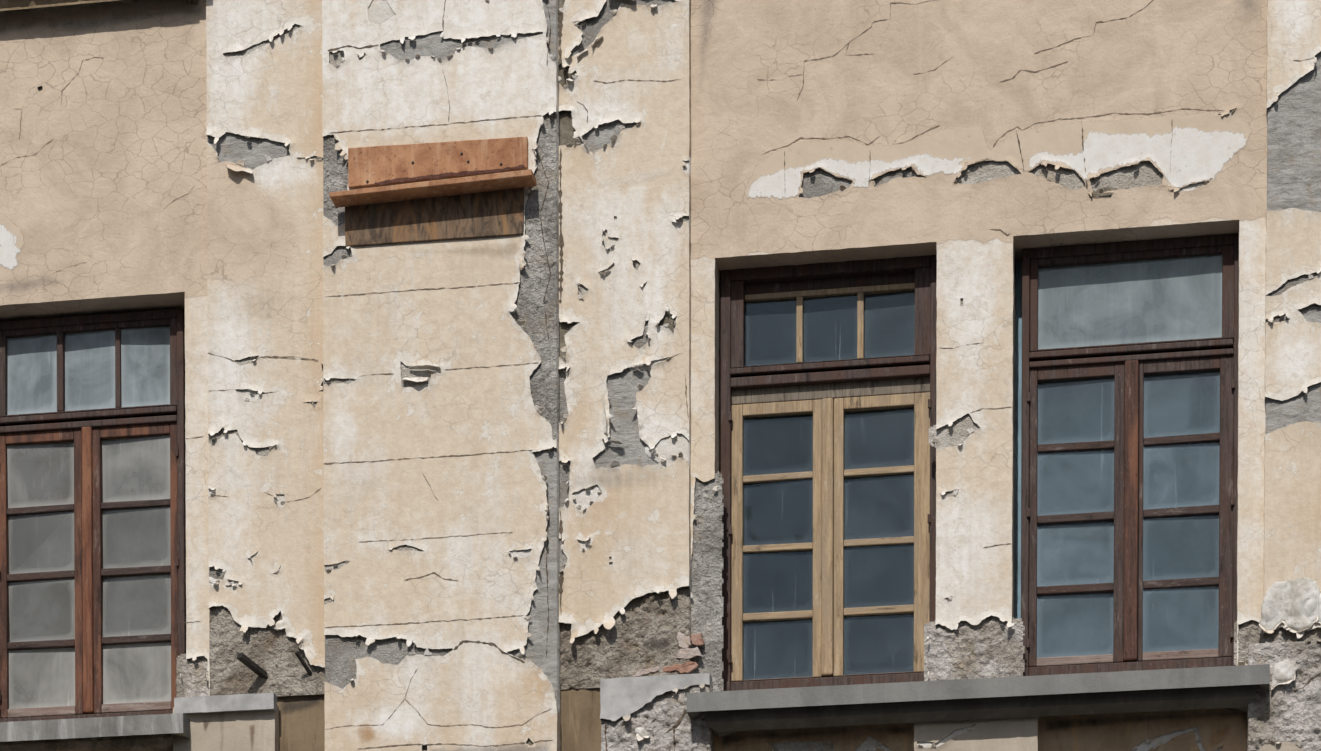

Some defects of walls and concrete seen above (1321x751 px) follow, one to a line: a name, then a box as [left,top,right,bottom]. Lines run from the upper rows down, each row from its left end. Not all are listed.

crack [758,0,933,98]
crack [1001,0,1153,82]
spalling [207,132,348,228]
crack [764,125,939,183]
peeling [745,52,1321,212]
crack [993,108,1220,187]
spalling [1266,303,1321,323]
spalling [503,110,724,751]
spalling [1265,382,1321,434]
spalling [176,606,453,698]
spalling [924,615,1025,681]
spalling [1234,620,1321,751]